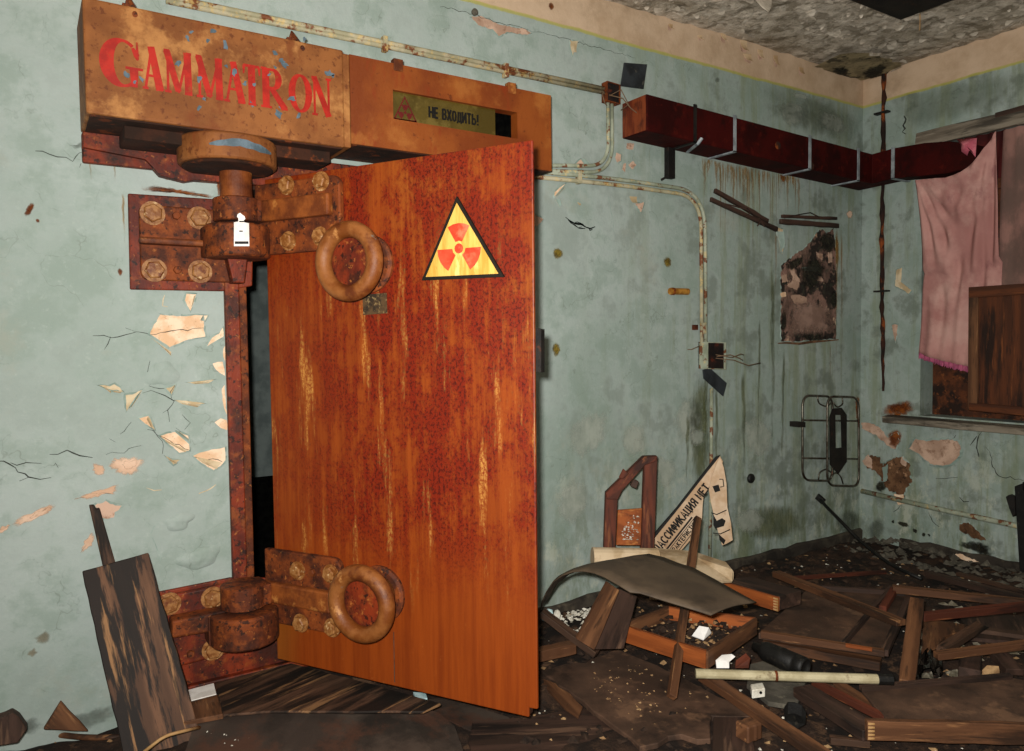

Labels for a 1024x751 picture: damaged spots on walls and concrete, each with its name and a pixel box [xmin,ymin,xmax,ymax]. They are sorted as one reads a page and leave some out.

peeling [470,15,532,38]
water stain [864,65,886,79]
corrosion [150,184,220,197]
crack [94,329,148,348]
peeling [147,292,227,430]
crack [0,362,188,481]
peeling [98,382,227,472]
peeling [94,458,142,475]
flaking render [861,422,963,505]
peeling [81,486,124,520]
peeling [0,505,52,533]